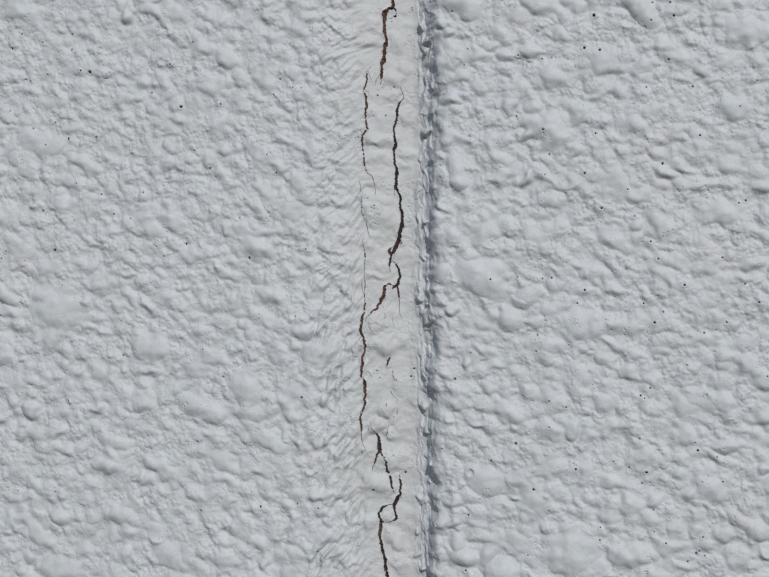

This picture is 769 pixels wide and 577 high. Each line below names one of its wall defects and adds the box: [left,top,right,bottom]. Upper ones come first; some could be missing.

crack [359,0,405,577]